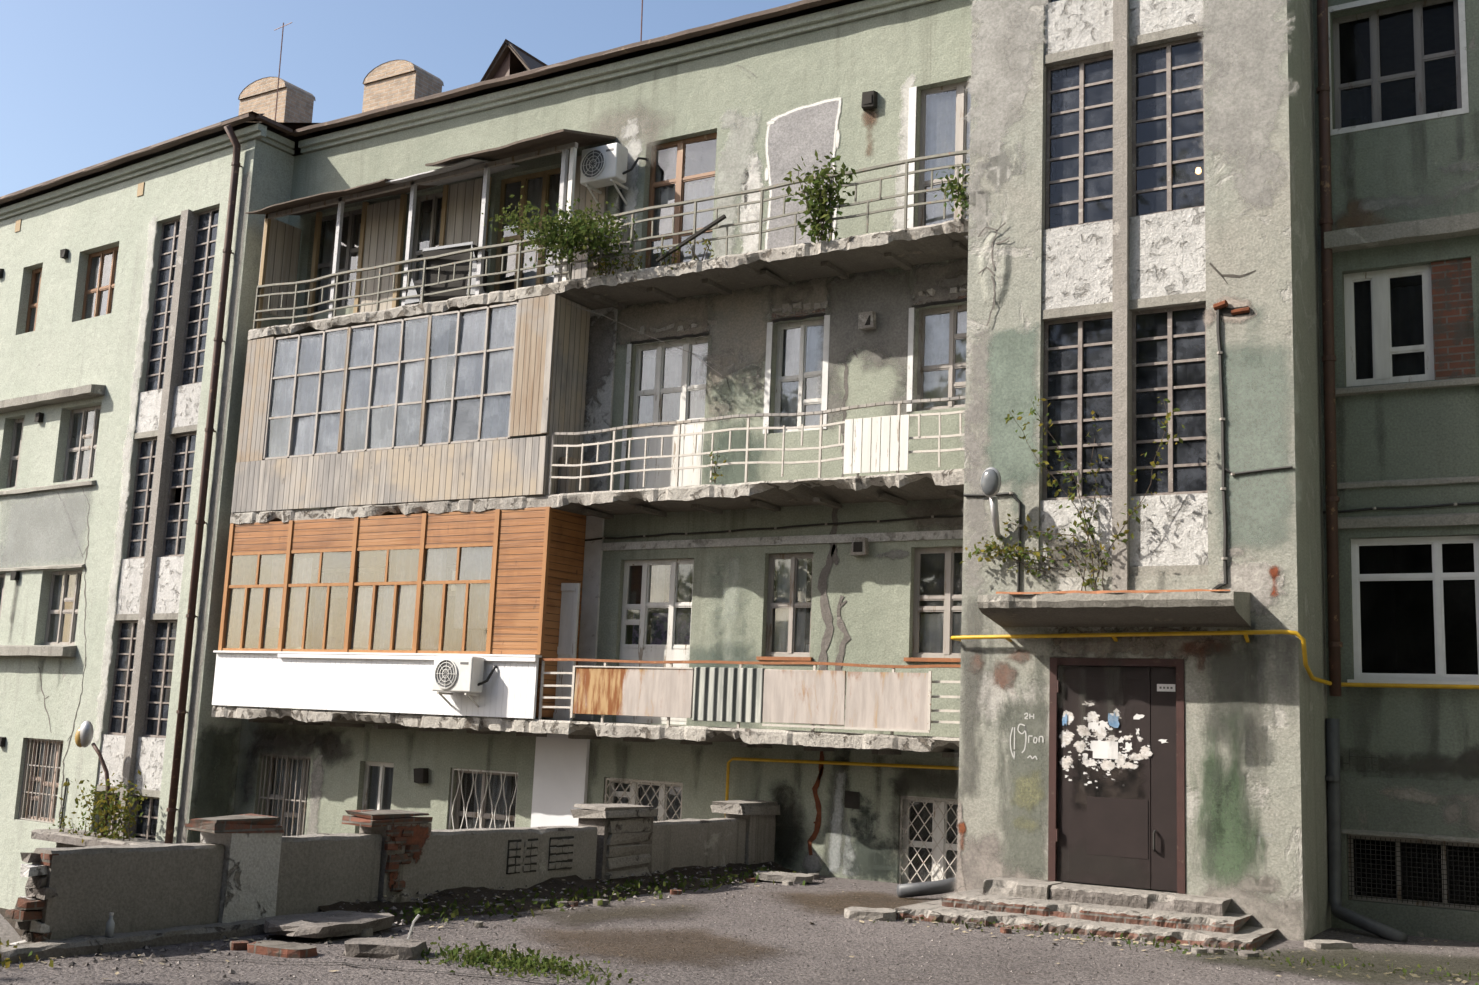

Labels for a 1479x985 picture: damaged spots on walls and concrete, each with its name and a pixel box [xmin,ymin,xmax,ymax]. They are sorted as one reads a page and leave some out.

peeling [714,111,774,258]
peeling [893,75,914,229]
peeling [963,0,1048,236]
peeling [584,258,968,463]
crack [817,351,858,671]
crack [38,489,90,844]